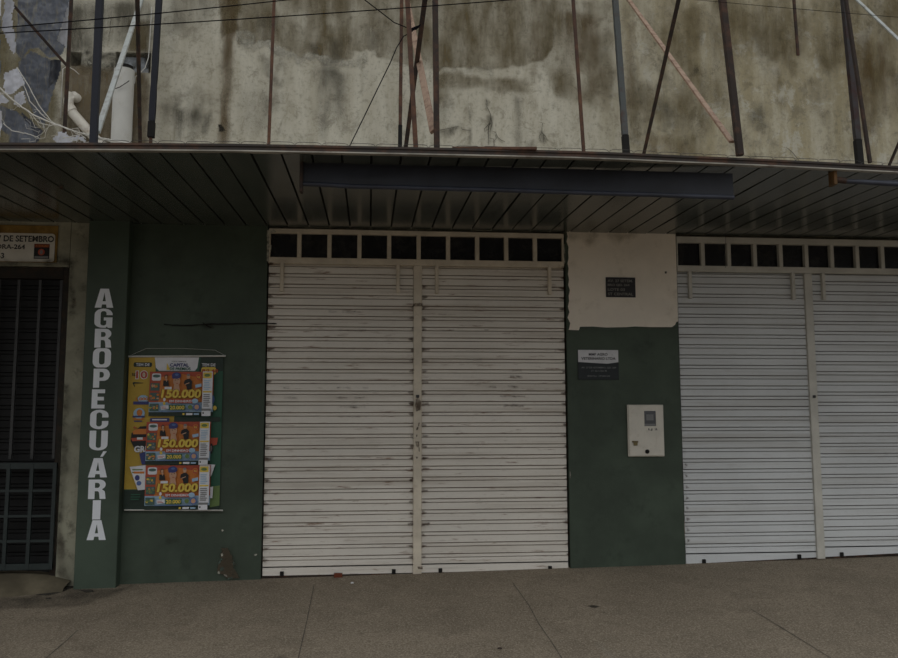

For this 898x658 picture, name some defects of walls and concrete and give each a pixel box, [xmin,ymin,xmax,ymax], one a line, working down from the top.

damp [309,0,350,60]
damp [403,0,524,99]